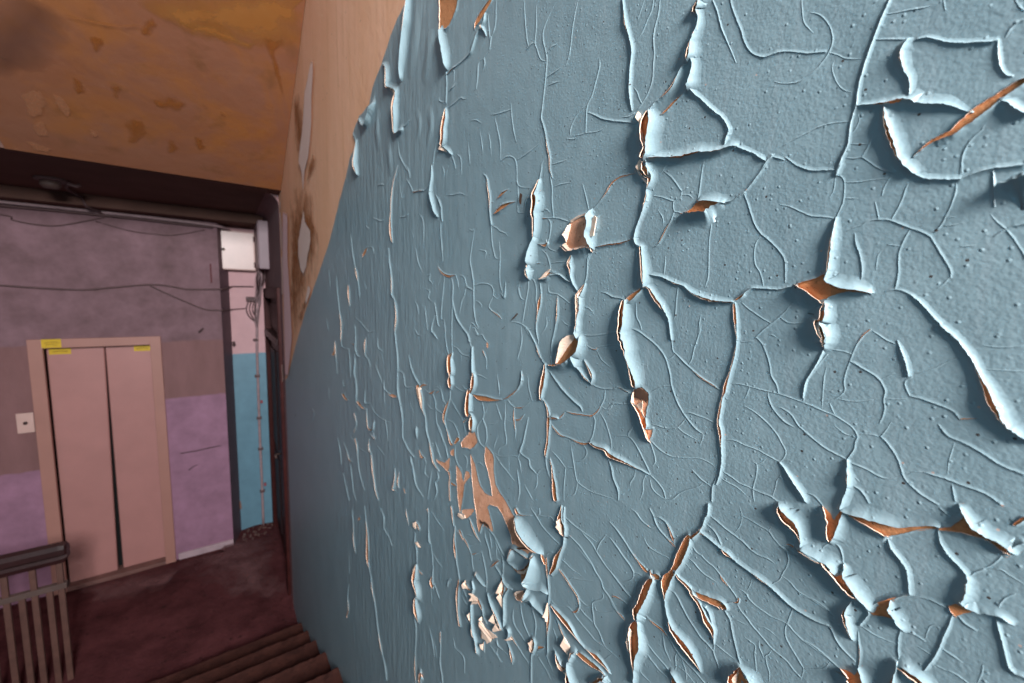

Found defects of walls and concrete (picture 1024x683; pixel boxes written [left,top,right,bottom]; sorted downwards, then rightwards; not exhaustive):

peeling [298,63,313,184]
peeling [352,0,412,178]
peeling [474,0,493,37]
peeling [298,211,310,273]
peeling [548,324,656,444]
crack [295,0,1024,683]
peeling [553,107,876,399]
peeling [435,427,549,665]
peeling [671,493,1024,683]